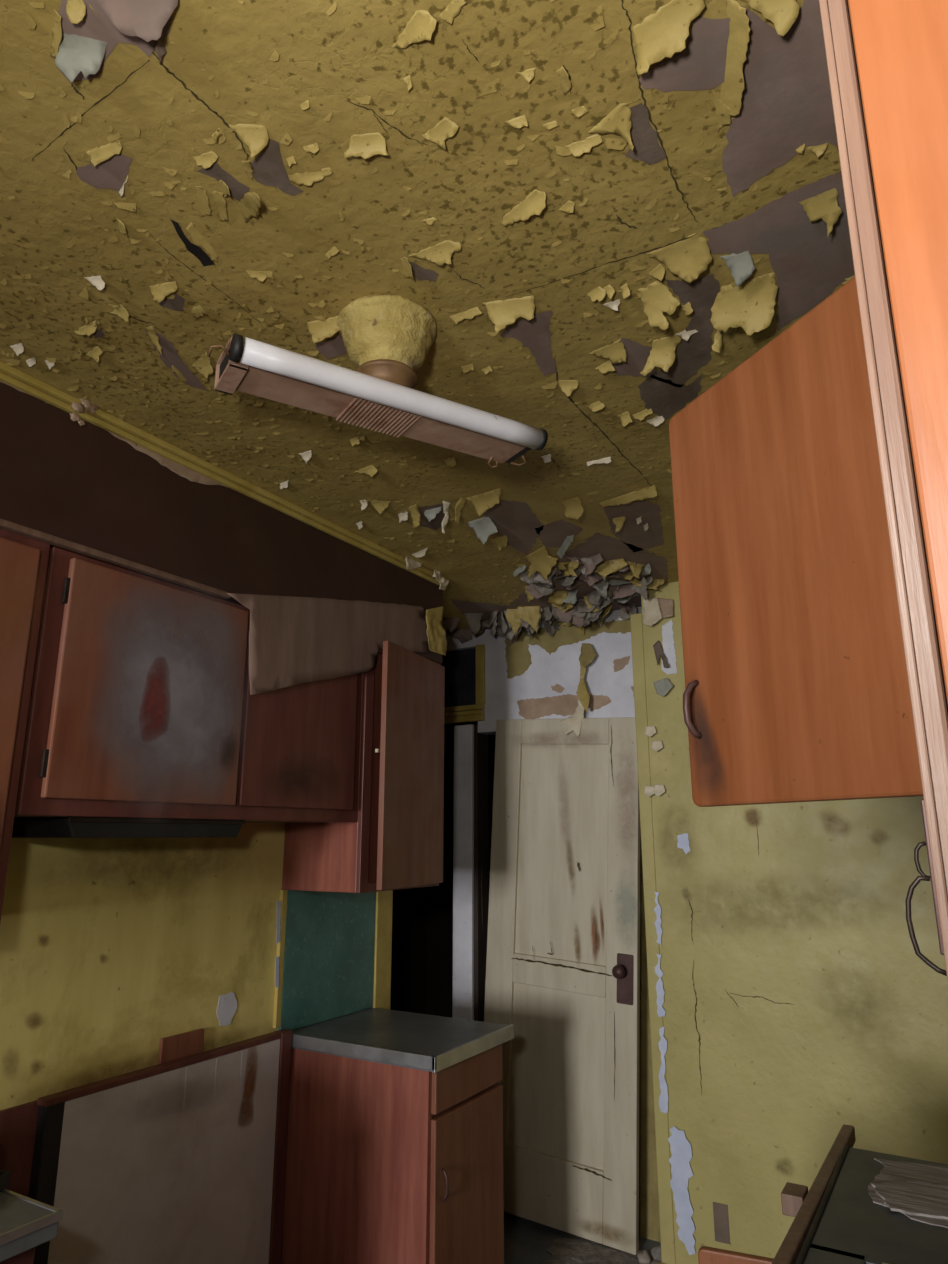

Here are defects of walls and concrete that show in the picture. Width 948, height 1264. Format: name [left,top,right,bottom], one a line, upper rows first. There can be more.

peeling [50,0,178,83]
peeling [170,123,333,266]
crack [454,0,727,296]
peeling [564,0,838,198]
peeling [450,296,579,397]
peeling [585,172,855,427]
flaking render [356,485,677,696]
damp [747,811,758,824]
peeling [654,891,669,1113]
crack [688,899,702,1094]
crack [726,991,790,1006]
peeling [668,1126,696,1255]